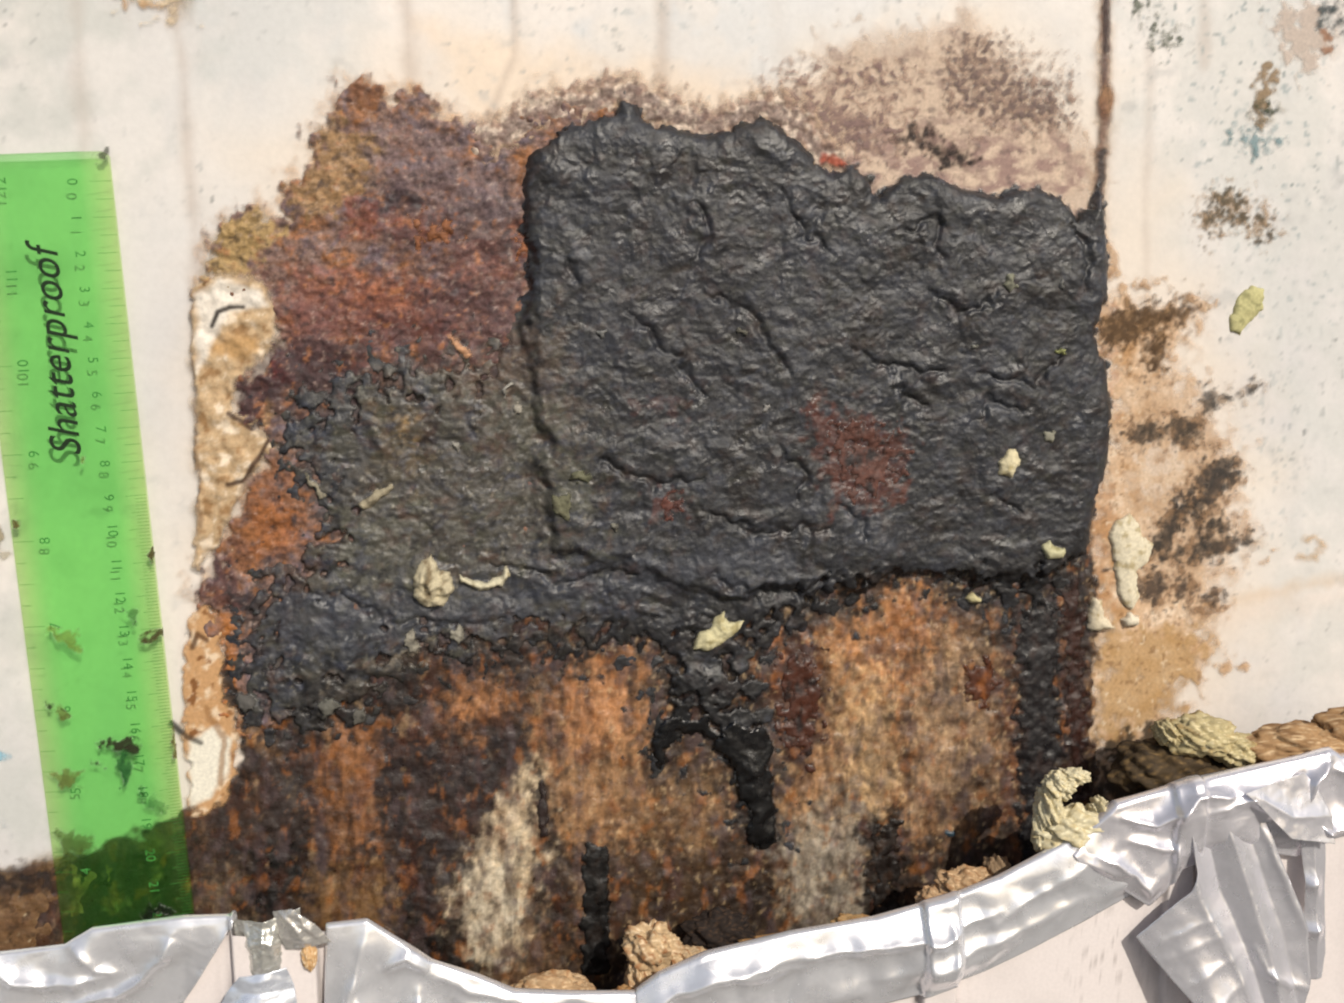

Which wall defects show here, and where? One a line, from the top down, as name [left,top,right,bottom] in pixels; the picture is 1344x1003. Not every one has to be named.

peeling [471,68,846,171]
damp [778,28,1096,222]
crack [1092,0,1116,261]
damp [1132,0,1183,52]
damp [1199,186,1276,244]
damp [1251,0,1344,130]
peeling [189,274,275,571]
rust [35,73,1113,990]
damp [1088,263,1263,802]
peeling [169,605,239,817]